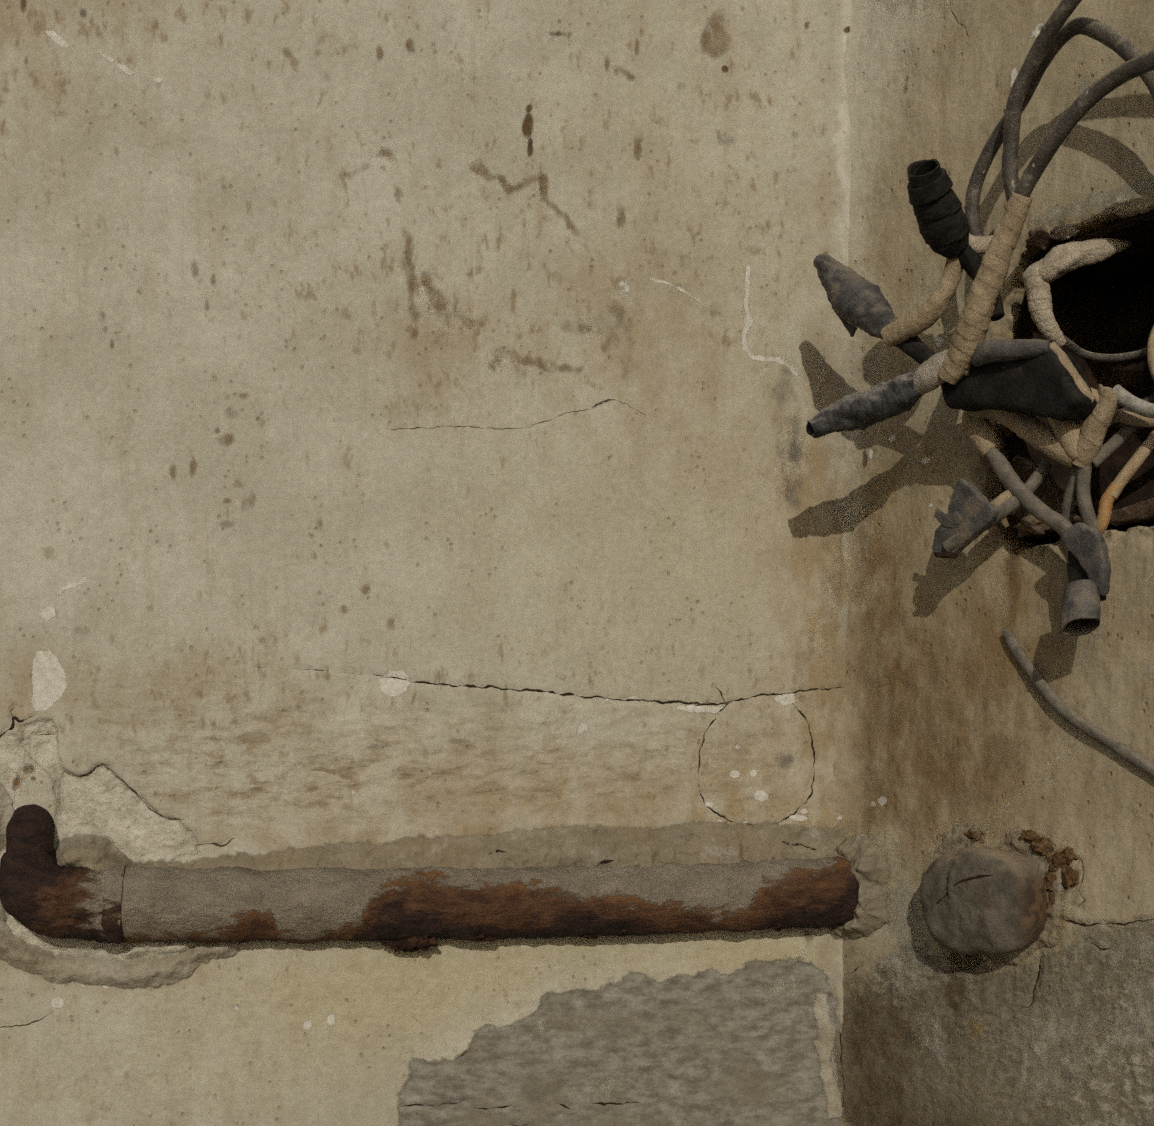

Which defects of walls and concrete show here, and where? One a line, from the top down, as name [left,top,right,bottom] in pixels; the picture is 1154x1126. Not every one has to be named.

crack [391,399,644,430]
spalling [0,651,197,864]
crack [352,673,843,859]
spalling [4,910,132,962]
damp [891,885,920,993]
rust [962,829,984,843]
rust [1013,830,1079,910]
crack [1061,859,1154,952]
peeling [397,958,843,1126]